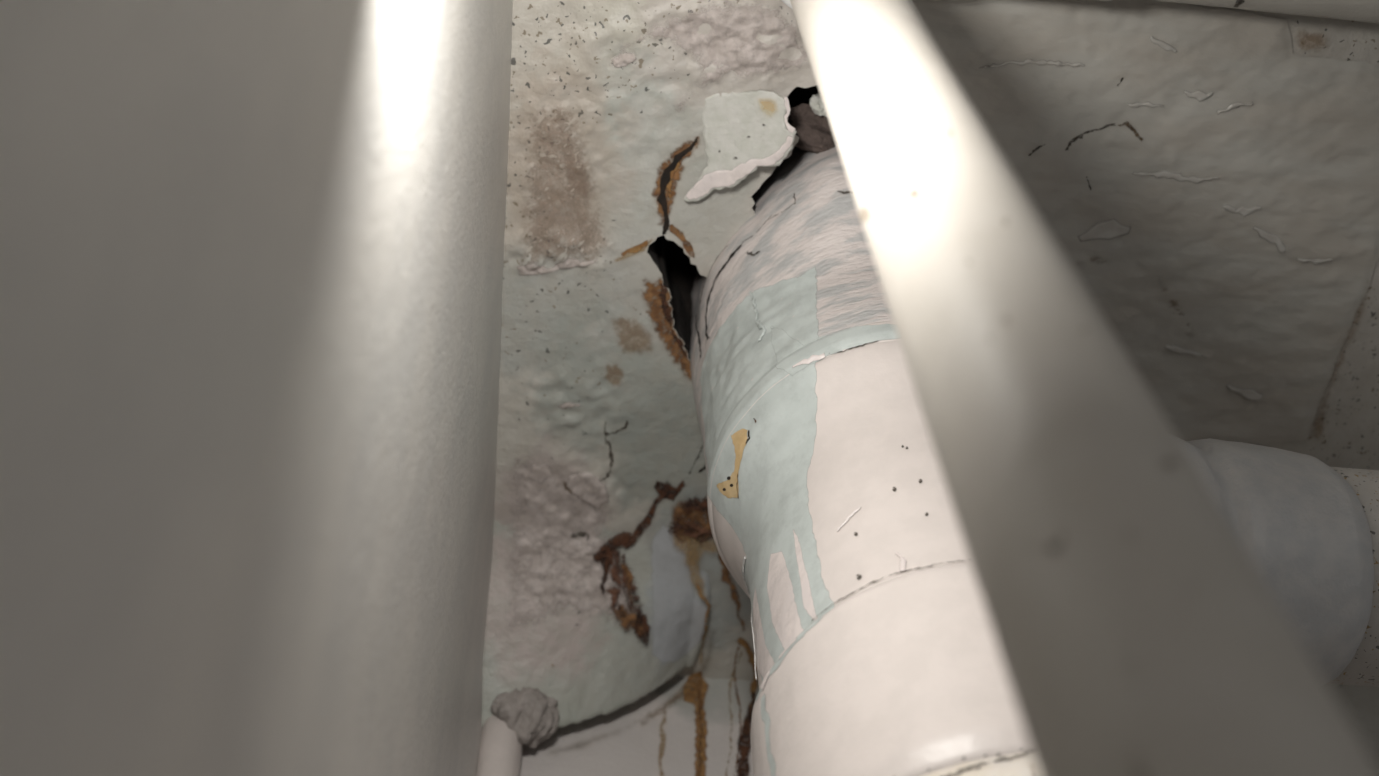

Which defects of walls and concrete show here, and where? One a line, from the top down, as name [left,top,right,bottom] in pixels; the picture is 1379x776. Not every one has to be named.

leakage [534,118,595,253]
crack [620,137,796,358]
flaking render [684,89,836,202]
crack [1028,122,1143,156]
corrosion [617,278,691,378]
corrosion [593,481,758,776]